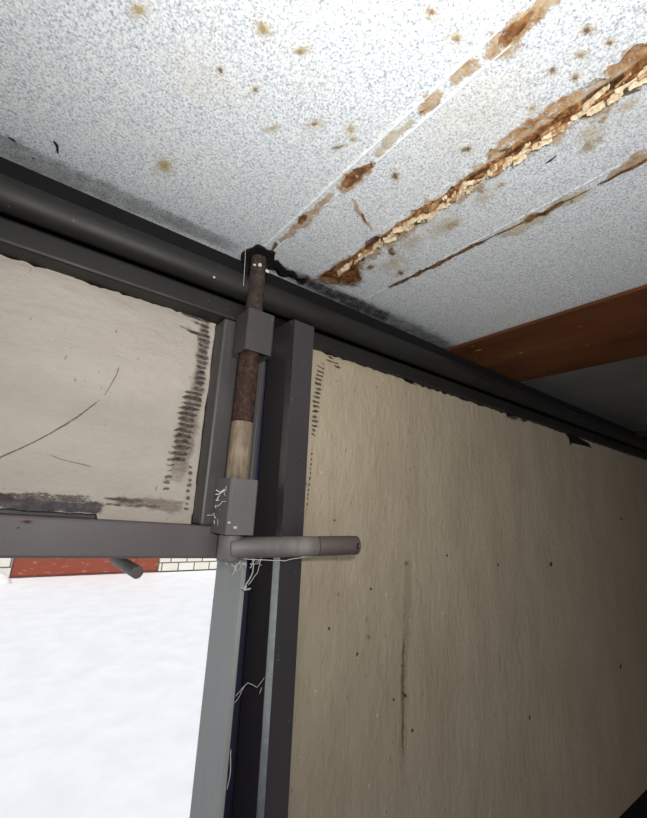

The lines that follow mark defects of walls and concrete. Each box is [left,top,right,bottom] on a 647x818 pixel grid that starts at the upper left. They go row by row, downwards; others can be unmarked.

corrosion [451,0,560,84]
corrosion [272,43,647,287]